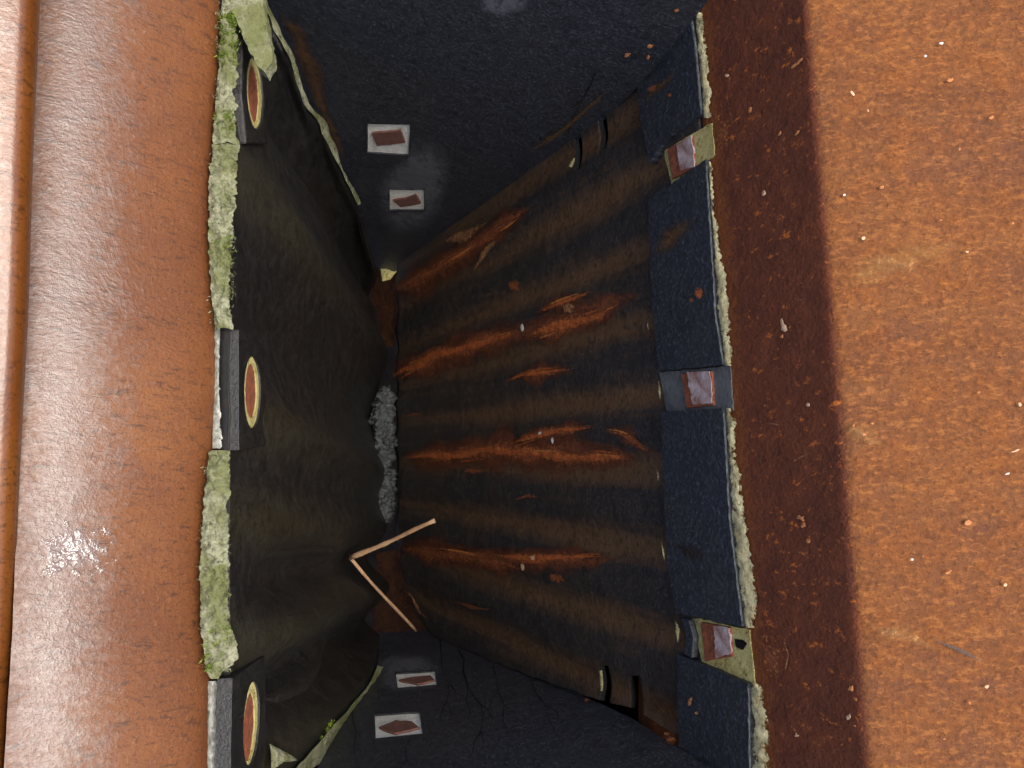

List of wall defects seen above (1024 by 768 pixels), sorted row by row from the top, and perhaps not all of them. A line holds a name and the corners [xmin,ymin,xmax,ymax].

corrosion [370,211,521,347]
corrosion [396,293,630,378]
corrosion [508,360,568,384]
corrosion [406,421,649,473]
corrosion [374,539,604,633]